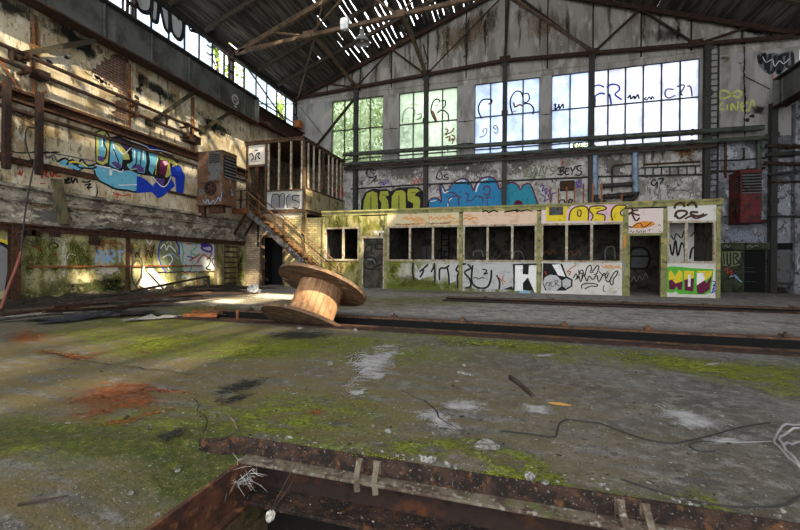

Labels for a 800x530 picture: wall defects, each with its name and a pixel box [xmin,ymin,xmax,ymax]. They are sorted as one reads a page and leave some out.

rust [30,26,41,69]
leakage [437,9,497,56]
leakage [518,6,570,46]
leakage [642,15,681,41]
spalling [45,44,150,127]
leakage [23,238,131,294]
rust [74,384,189,424]